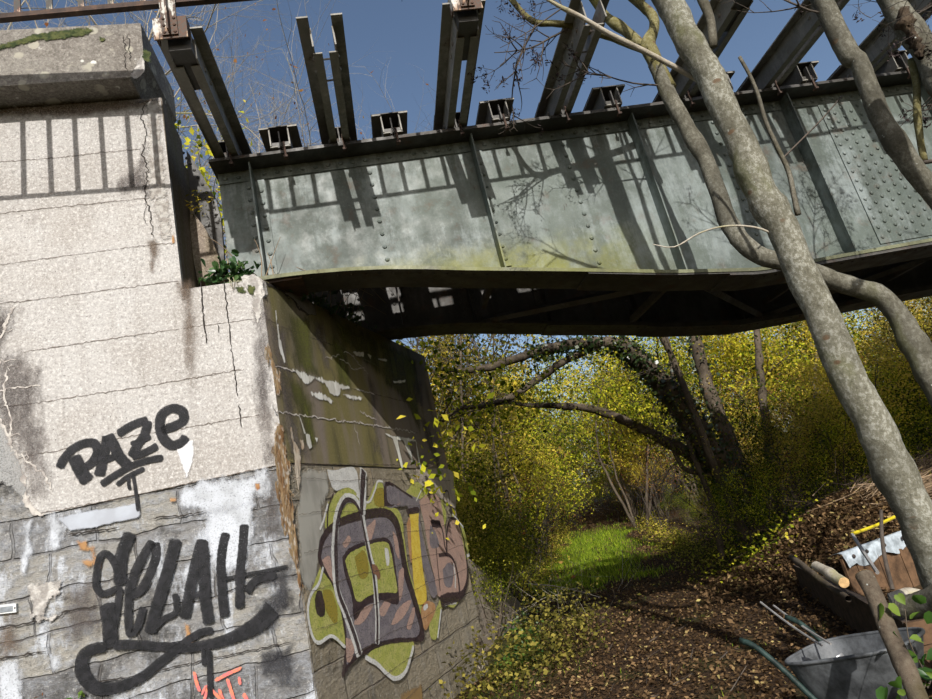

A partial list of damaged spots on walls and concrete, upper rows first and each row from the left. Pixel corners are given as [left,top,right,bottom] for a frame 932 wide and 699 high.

leakage [0,99,155,116]
leakage [118,161,145,191]
crack [140,102,154,238]
crack [200,282,242,428]
spalling [264,343,281,396]
leakage [256,310,439,469]
spalling [271,423,304,596]